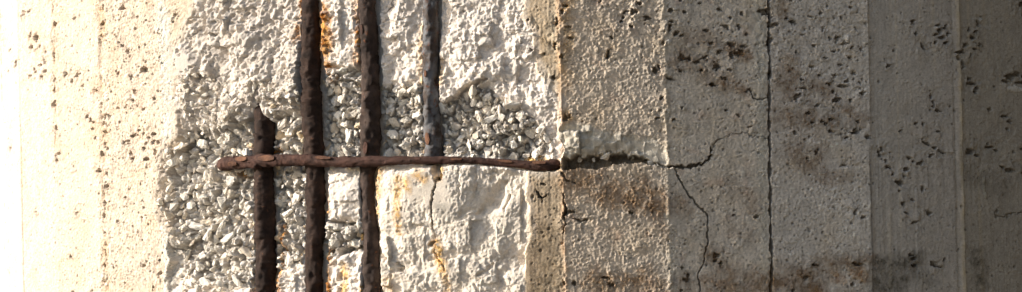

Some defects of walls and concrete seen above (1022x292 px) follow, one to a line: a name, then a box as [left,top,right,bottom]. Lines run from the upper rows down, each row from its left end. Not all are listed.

rust [320,2,332,68]
spalling [28,0,307,292]
rust [228,150,283,176]
spalling [319,0,364,292]
rust [393,174,425,235]
crack [429,177,445,271]
spalling [374,0,673,292]
crack [667,1,775,292]
rust [326,252,348,292]
spalling [678,264,691,292]